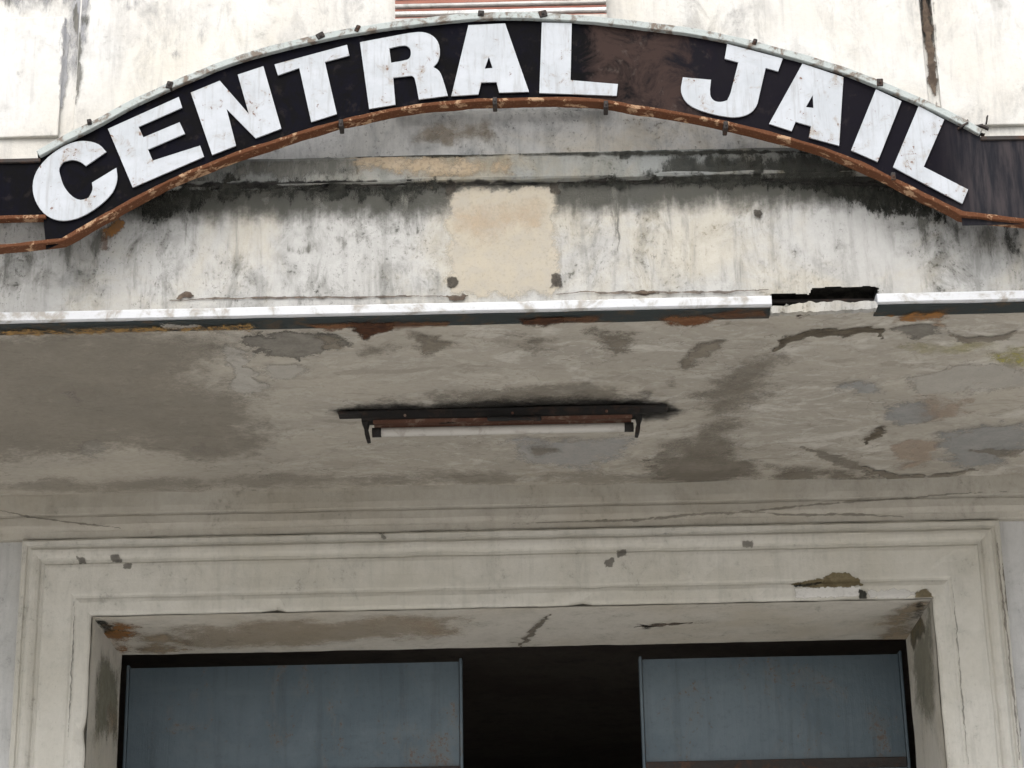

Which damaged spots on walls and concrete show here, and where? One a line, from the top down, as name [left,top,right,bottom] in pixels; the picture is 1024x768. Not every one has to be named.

damp [59,0,89,108]
damp [920,0,939,105]
rust [346,123,511,177]
rust [309,321,448,340]
rust [519,317,597,327]
rust [659,310,765,327]
spalling [770,287,878,317]
peeling [772,324,1017,352]
peeling [219,331,351,393]
damp [646,355,786,482]
spalling [792,572,933,599]
crack [518,614,551,648]